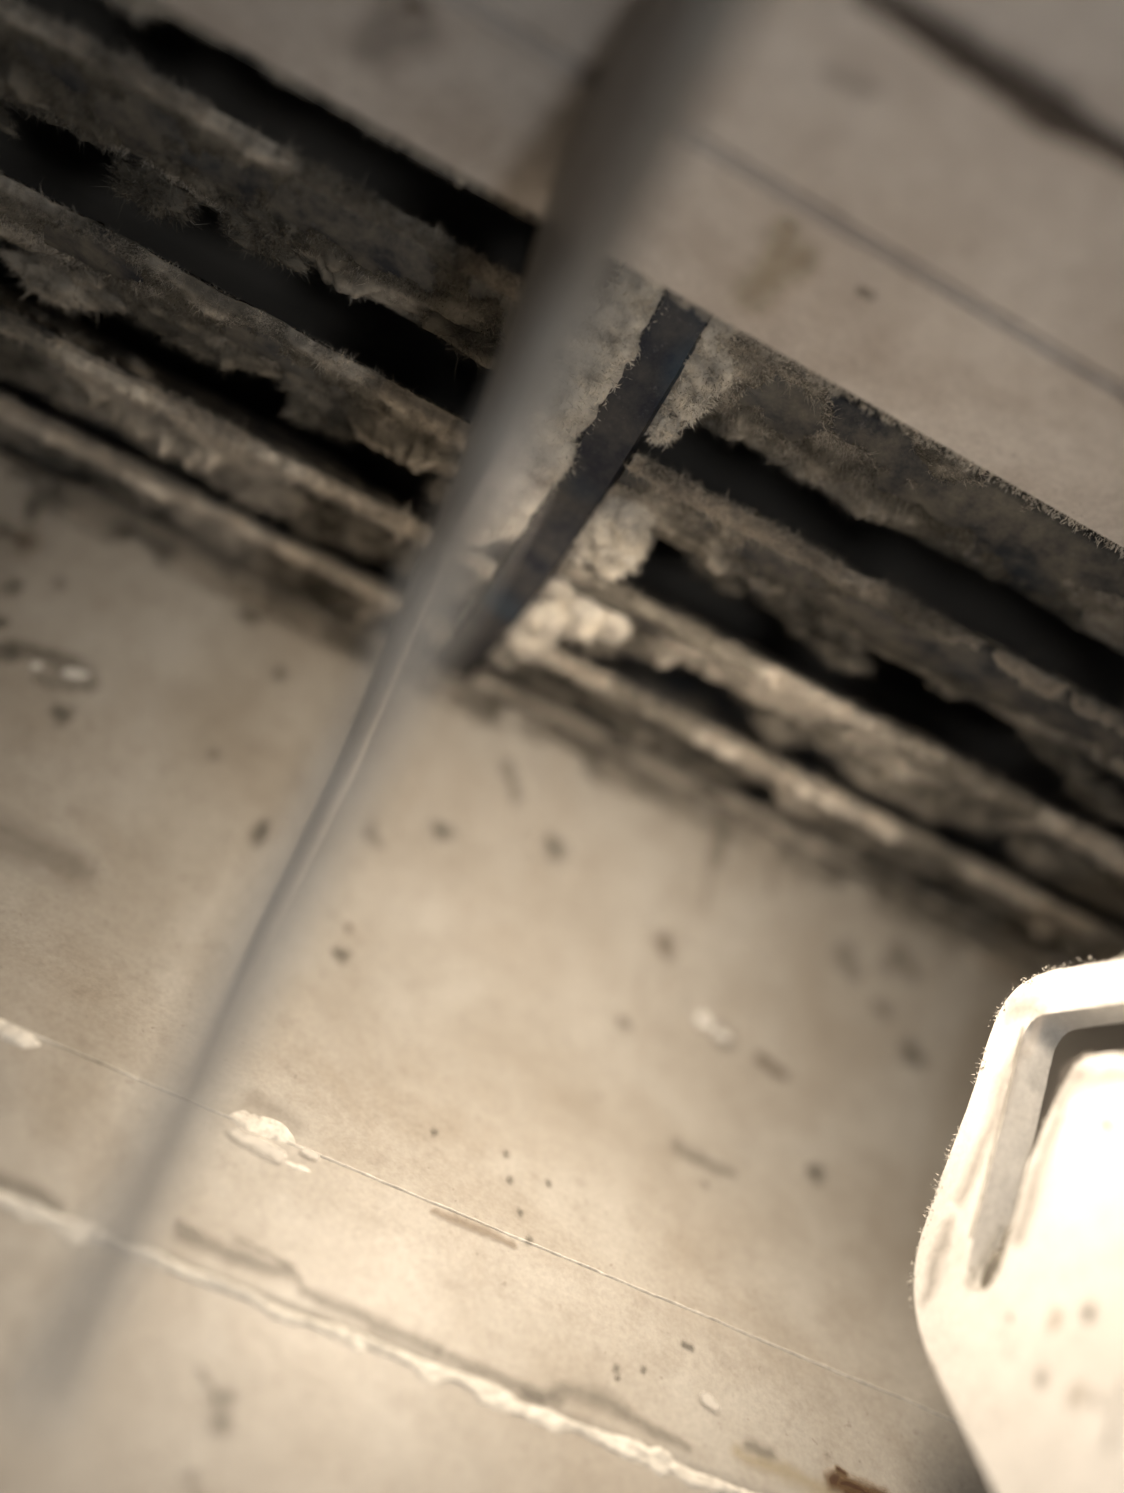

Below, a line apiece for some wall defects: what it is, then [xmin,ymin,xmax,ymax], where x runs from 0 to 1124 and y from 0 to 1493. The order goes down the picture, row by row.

peeling [62,668,89,679]
corrosion [826,1466,886,1493]